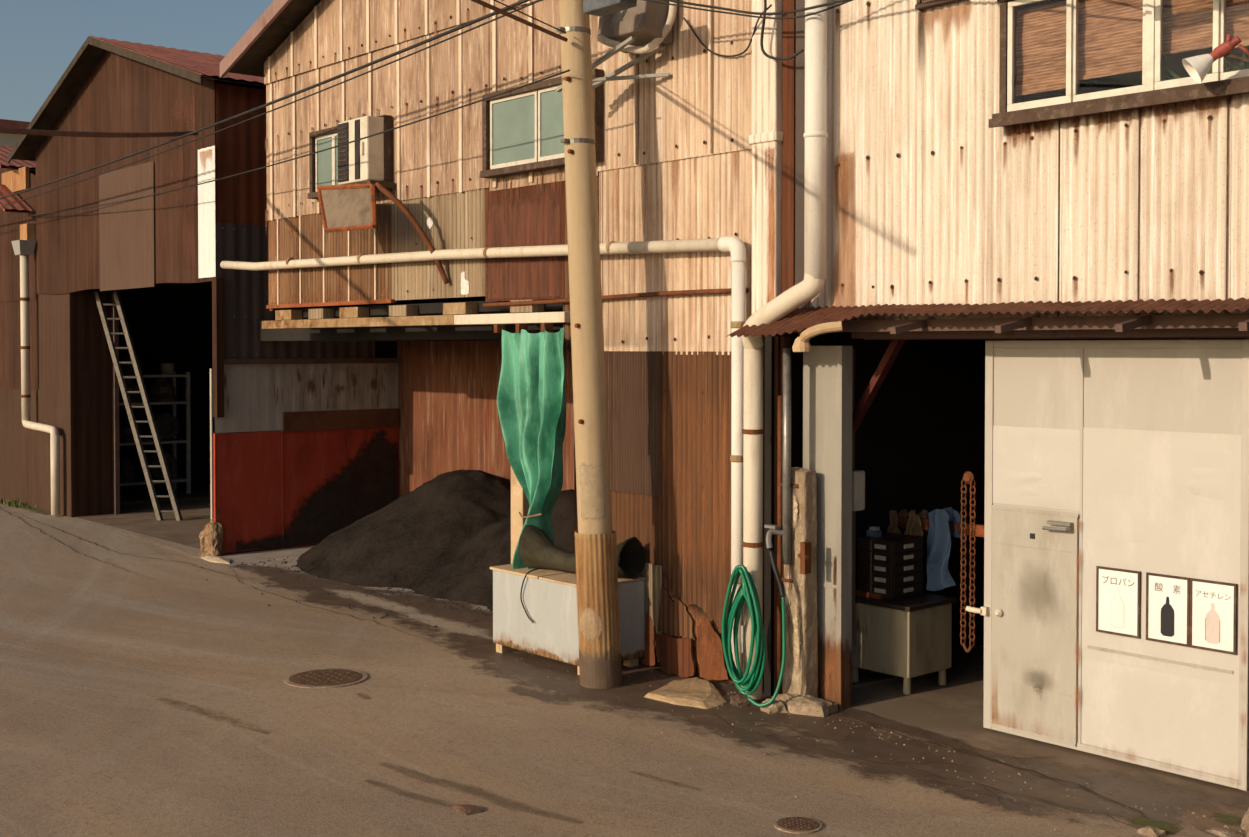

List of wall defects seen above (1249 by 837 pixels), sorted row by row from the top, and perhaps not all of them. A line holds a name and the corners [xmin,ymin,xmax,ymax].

rust [834,155,869,308]
crack [0,508,438,644]
rust [638,586,732,680]
rust [818,645,836,701]